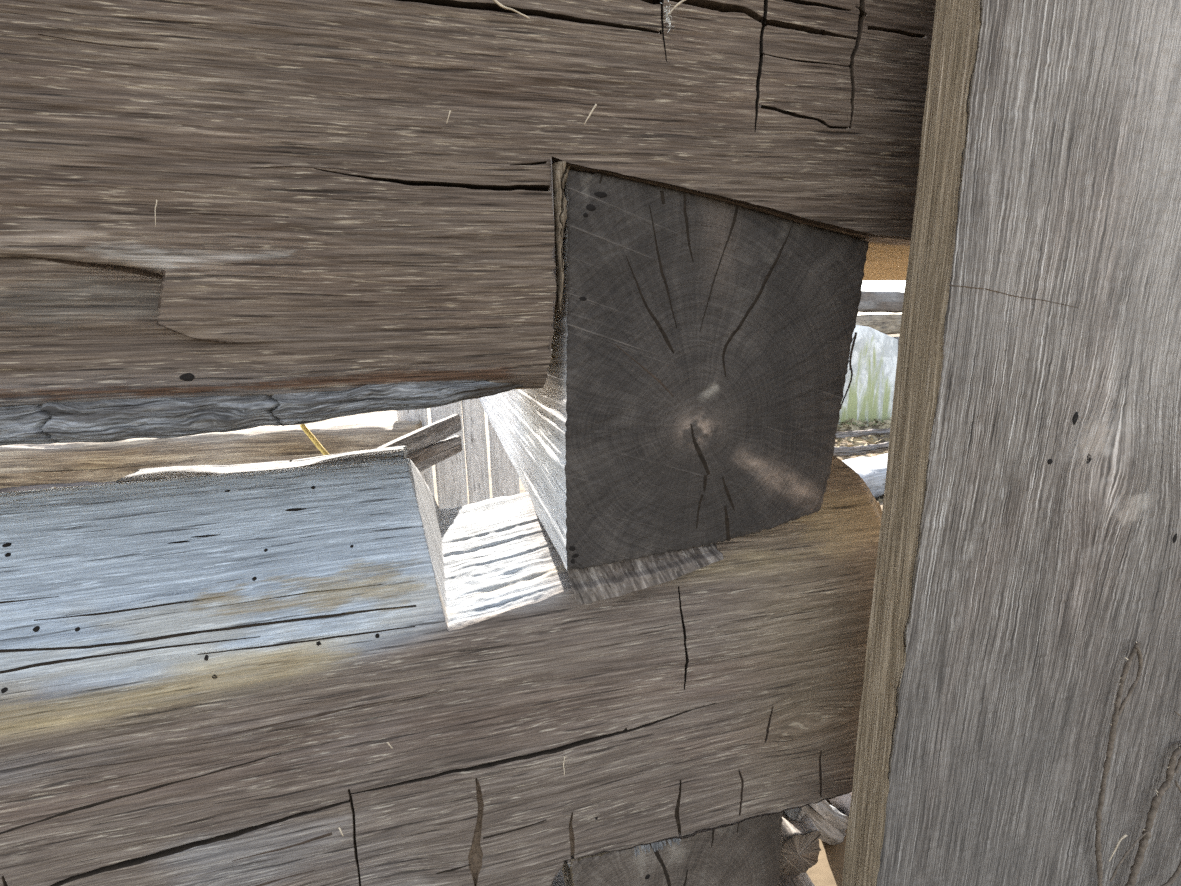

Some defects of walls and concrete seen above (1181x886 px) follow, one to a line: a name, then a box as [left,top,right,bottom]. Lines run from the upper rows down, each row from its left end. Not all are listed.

crack [38,34,158,50]
crack [374,0,926,134]
crack [149,210,289,218]
crack [253,157,550,196]
crack [626,191,739,354]
crack [722,225,811,377]
crack [690,424,735,541]
crack [0,584,716,886]